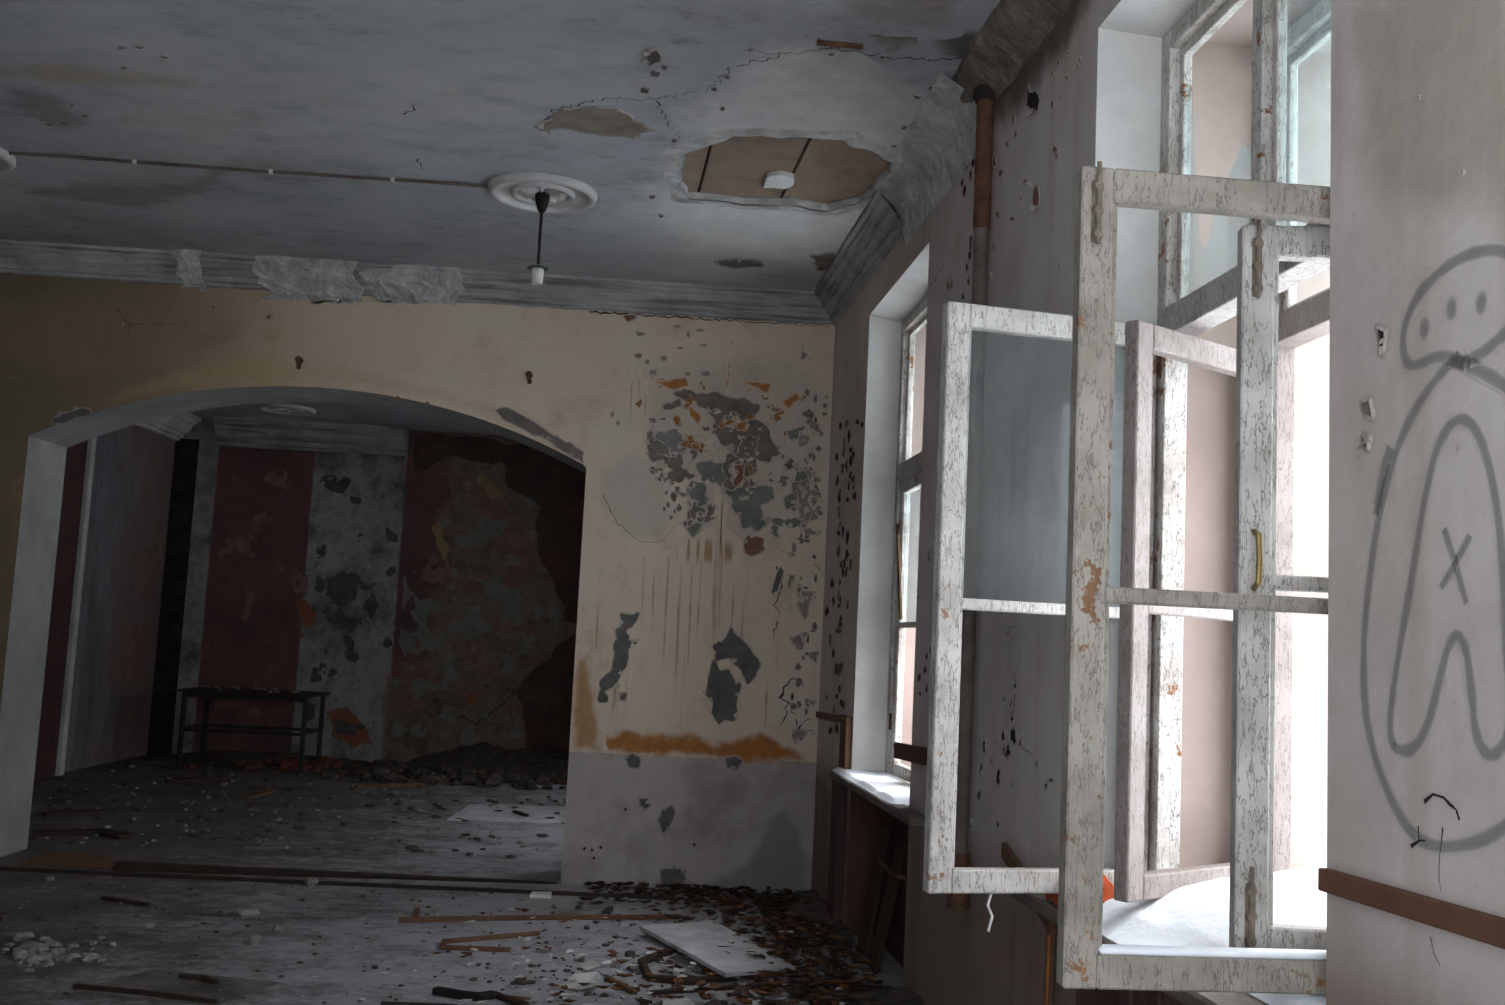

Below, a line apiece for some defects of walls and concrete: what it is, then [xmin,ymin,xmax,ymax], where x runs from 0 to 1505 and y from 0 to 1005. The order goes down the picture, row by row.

crack [533,35,963,148]
spalling [535,105,907,218]
peeling [320,475,362,505]
peeling [290,527,409,683]
flaking render [395,407,586,752]
peeling [597,611,641,703]
peeling [622,314,864,743]
peeling [307,702,375,749]